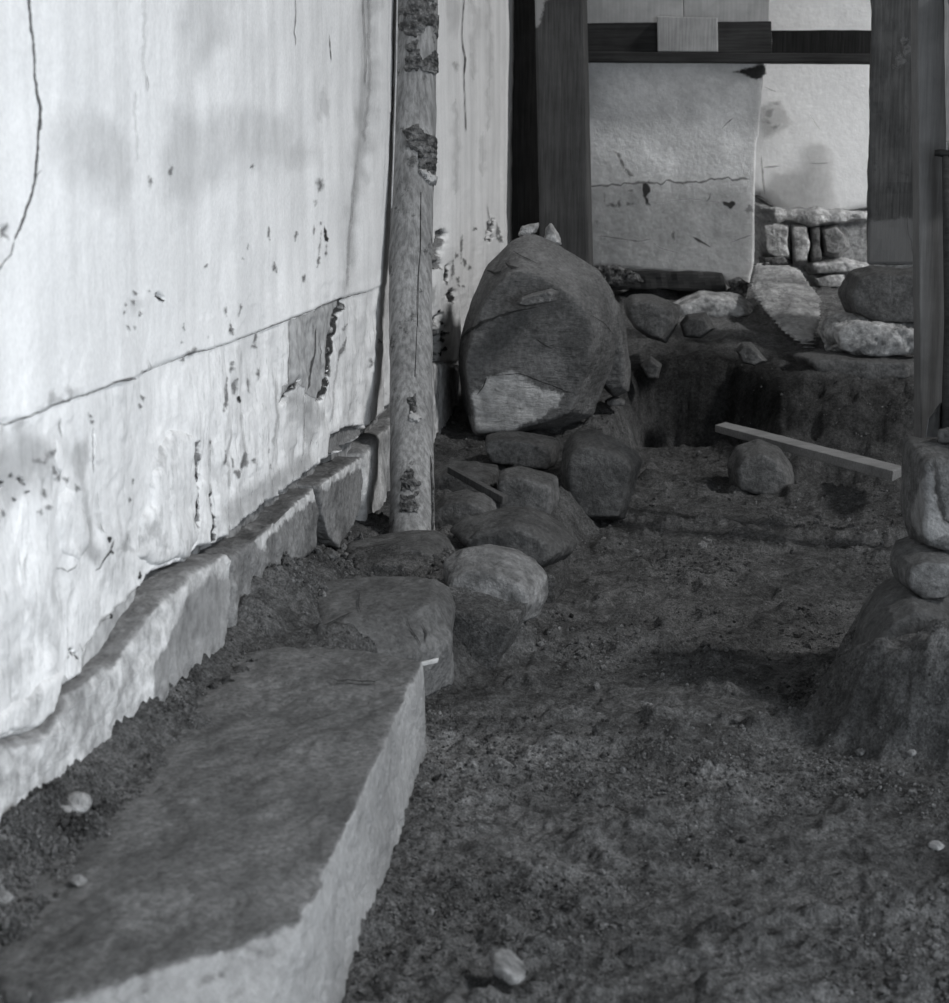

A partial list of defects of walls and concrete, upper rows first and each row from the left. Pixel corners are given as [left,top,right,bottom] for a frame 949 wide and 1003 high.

crack [0,0,42,269]
crack [591,158,777,207]
crack [0,292,365,425]
flaking render [279,299,346,402]
spalling [224,452,256,478]